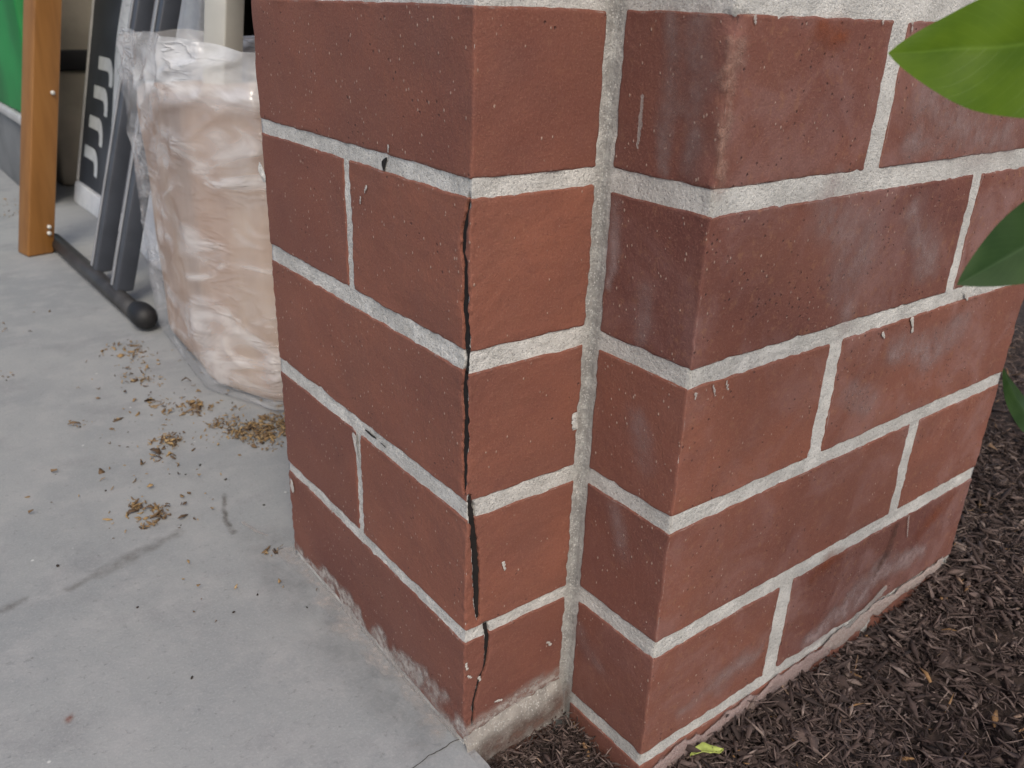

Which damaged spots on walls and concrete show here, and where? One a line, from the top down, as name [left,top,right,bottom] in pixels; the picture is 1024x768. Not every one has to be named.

leakage [294,550,438,699]
crack [413,202,488,768]